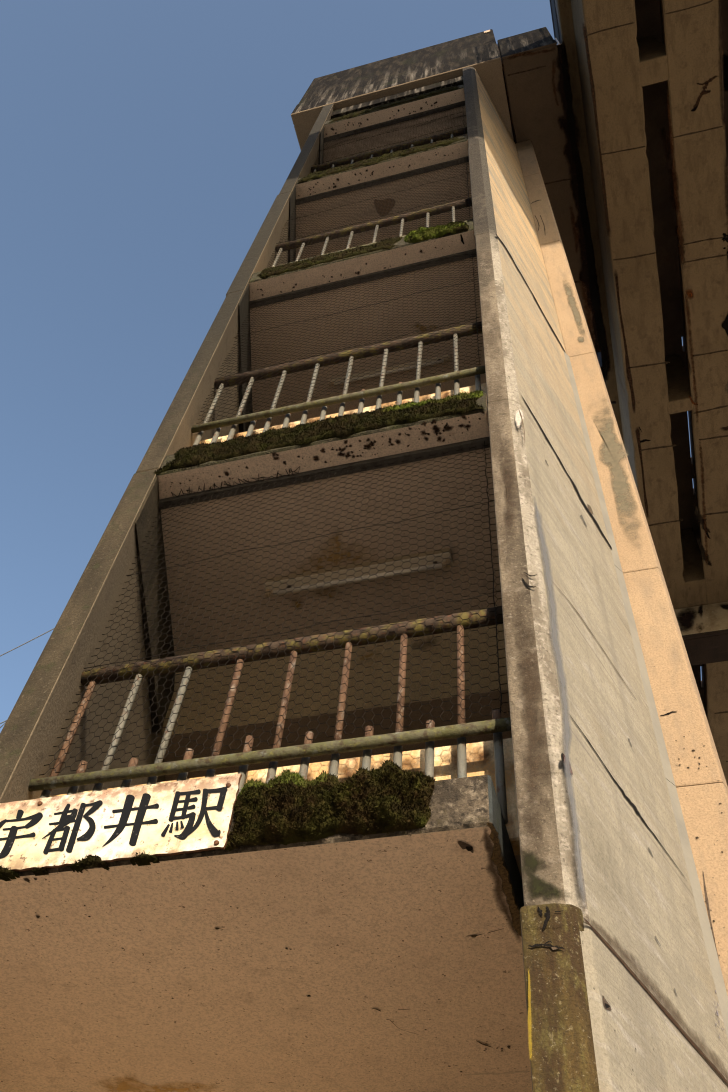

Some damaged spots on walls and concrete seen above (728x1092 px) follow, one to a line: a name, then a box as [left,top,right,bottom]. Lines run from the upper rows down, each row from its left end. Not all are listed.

crack [691,76,717,111]
damp [615,273,635,412]
damp [635,428,648,517]
peeling [458,822,522,938]